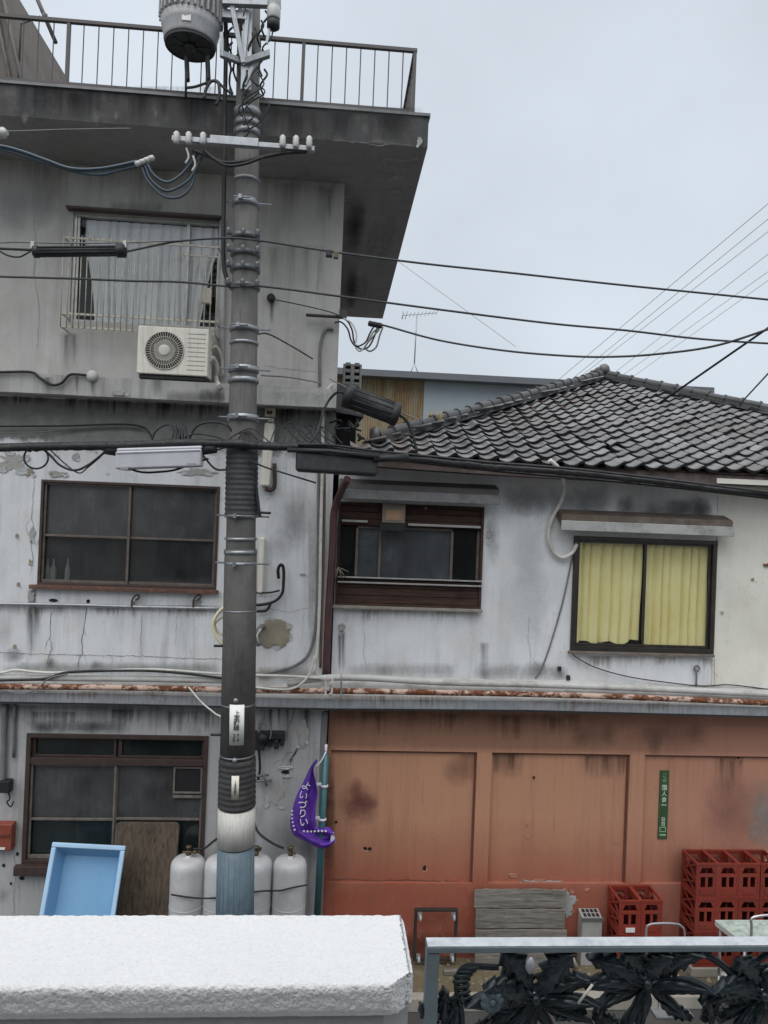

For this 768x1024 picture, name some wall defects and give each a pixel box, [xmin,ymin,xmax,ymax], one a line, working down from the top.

peeling [0,451,36,478]
crack [0,607,217,663]
spalling [256,617,292,650]